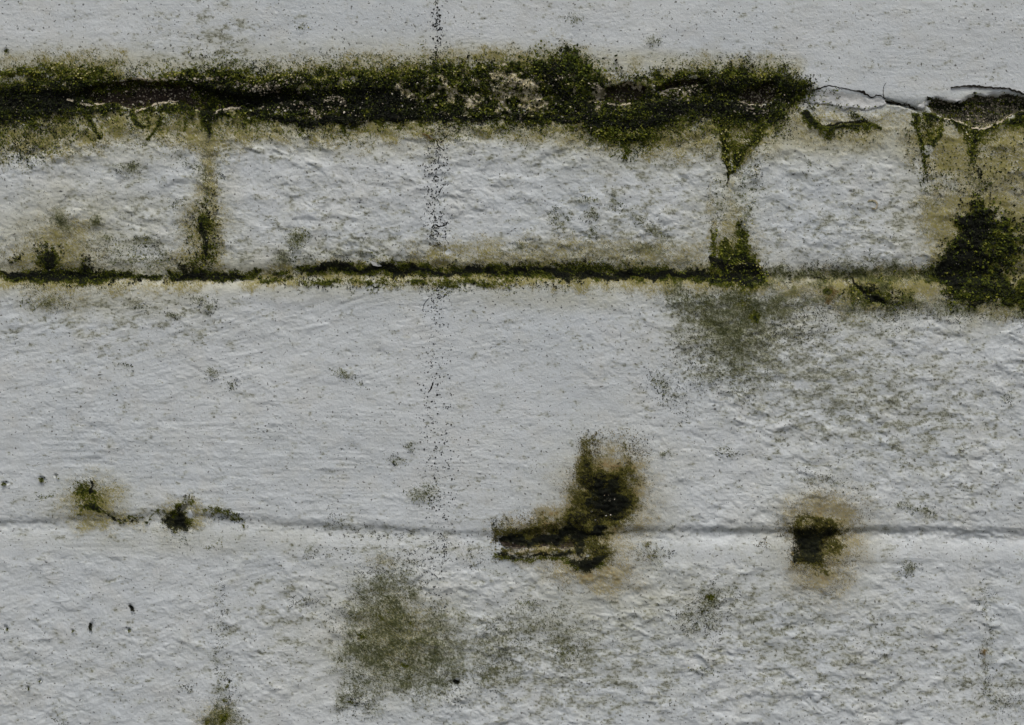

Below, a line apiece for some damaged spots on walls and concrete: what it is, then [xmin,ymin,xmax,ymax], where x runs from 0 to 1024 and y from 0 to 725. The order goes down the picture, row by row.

peeling [796,77,887,112]
flaking render [916,85,1024,130]